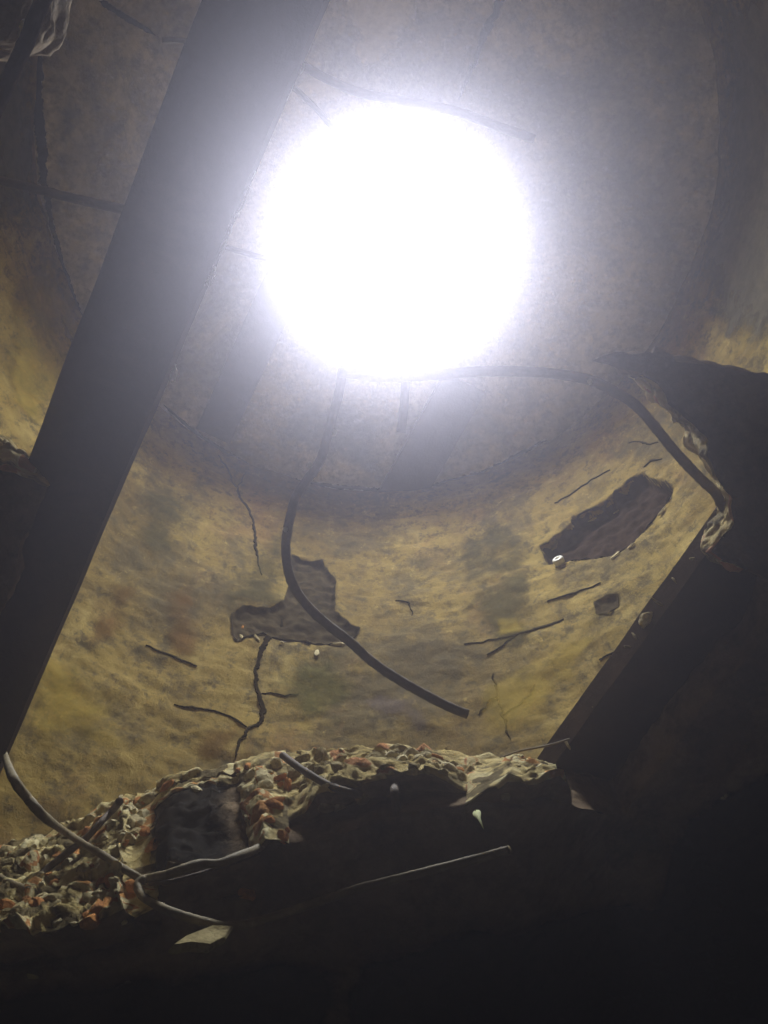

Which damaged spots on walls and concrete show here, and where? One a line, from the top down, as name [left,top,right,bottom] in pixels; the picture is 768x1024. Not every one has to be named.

crack [218,455,262,575]
spalling [231,361,748,719]
crack [554,469,610,503]
crack [146,645,197,667]
crack [174,619,310,760]
crack [464,582,601,738]
spalling [0,743,572,964]